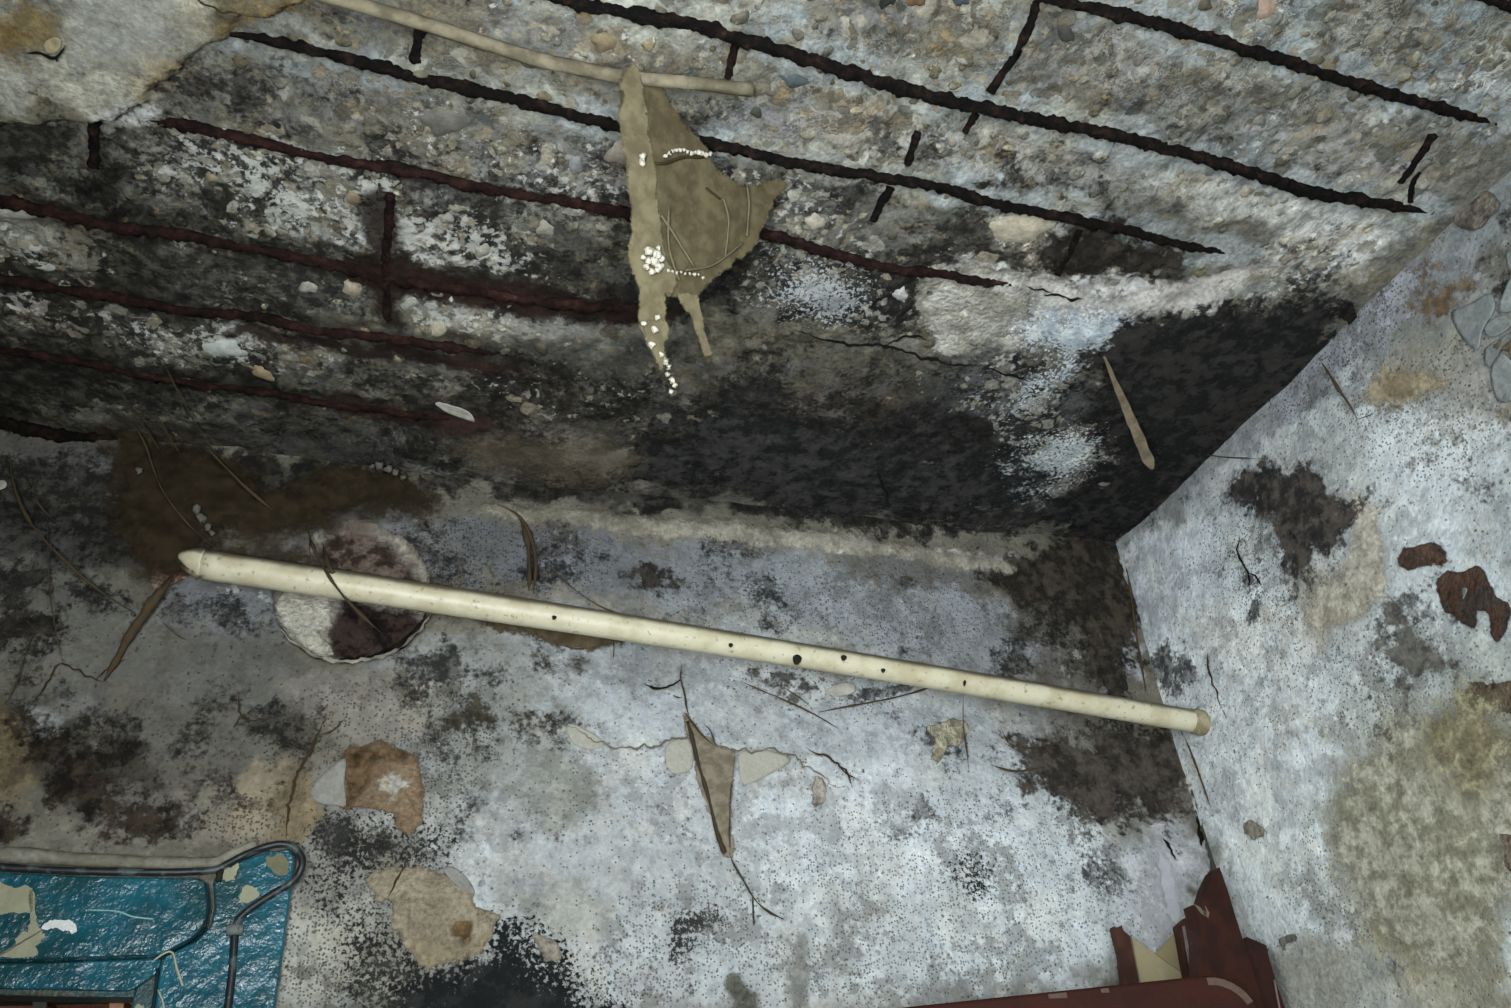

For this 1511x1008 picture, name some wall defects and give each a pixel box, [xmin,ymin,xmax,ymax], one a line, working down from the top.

crack [198,0,248,15]
corrosion [223,189,640,375]
corrosion [665,307,681,320]
spalling [0,0,1511,457]
corrosion [329,393,496,435]
water stain [499,214,1350,698]
peeling [1436,565,1511,642]
water stain [747,666,824,710]
water stain [0,703,200,849]
peeling [310,739,425,835]
peeling [365,855,501,968]
water stain [295,805,643,1008]